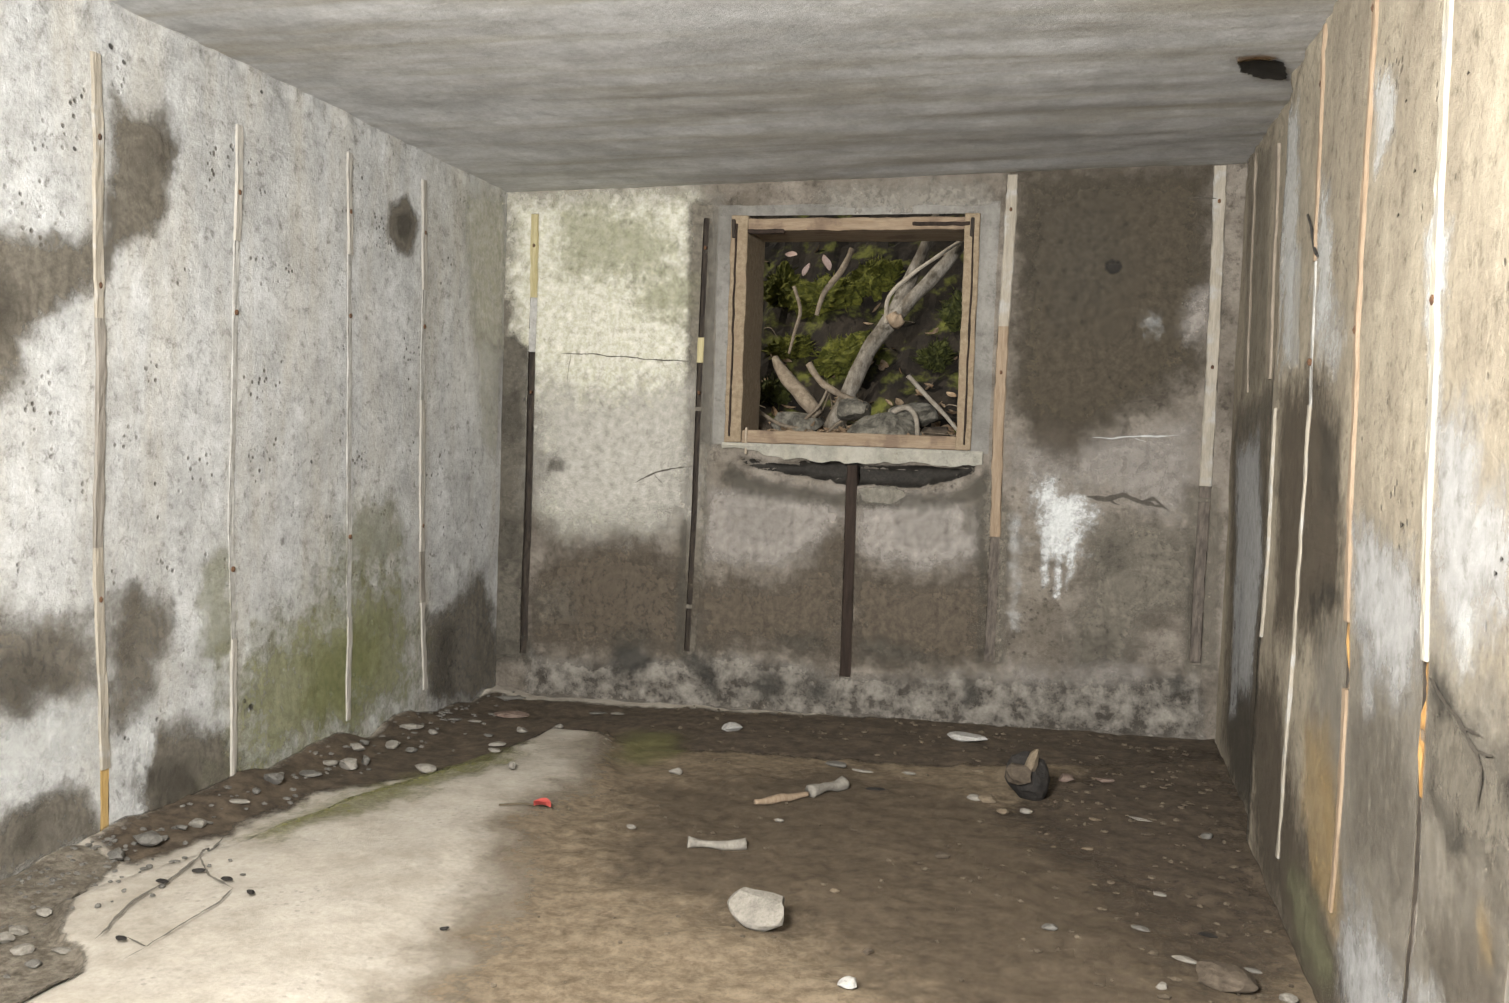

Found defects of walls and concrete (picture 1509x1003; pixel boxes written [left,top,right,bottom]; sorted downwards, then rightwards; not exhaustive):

water stain [0,96,177,395]
water stain [0,787,99,880]
water stain [0,591,239,815]
water stain [426,201,1010,706]
water stain [1012,166,1509,1003]